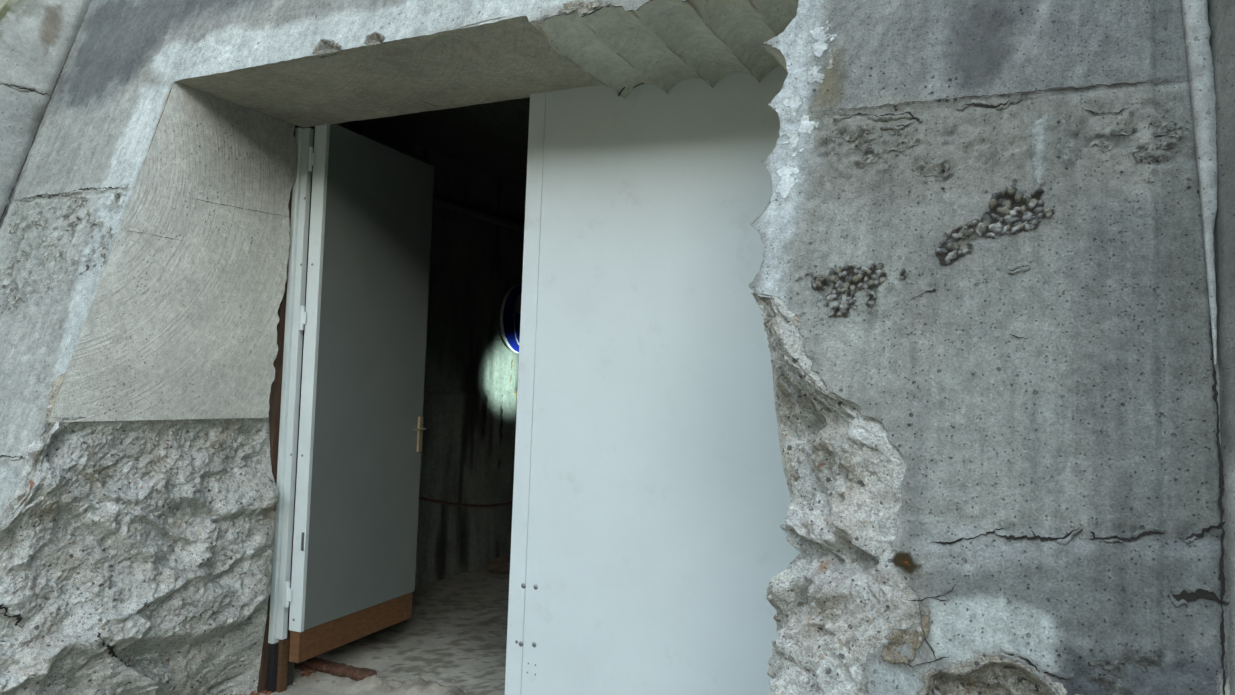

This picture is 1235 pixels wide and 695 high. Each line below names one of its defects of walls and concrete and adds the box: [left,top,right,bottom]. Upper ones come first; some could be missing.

spalling [536,0,614,22]
crack [817,81,1179,131]
spalling [751,292,930,695]
crack [930,319,1229,695]
spalling [0,371,279,695]
corrosion [892,551,922,573]
crack [0,603,23,629]
spalling [918,651,1067,695]